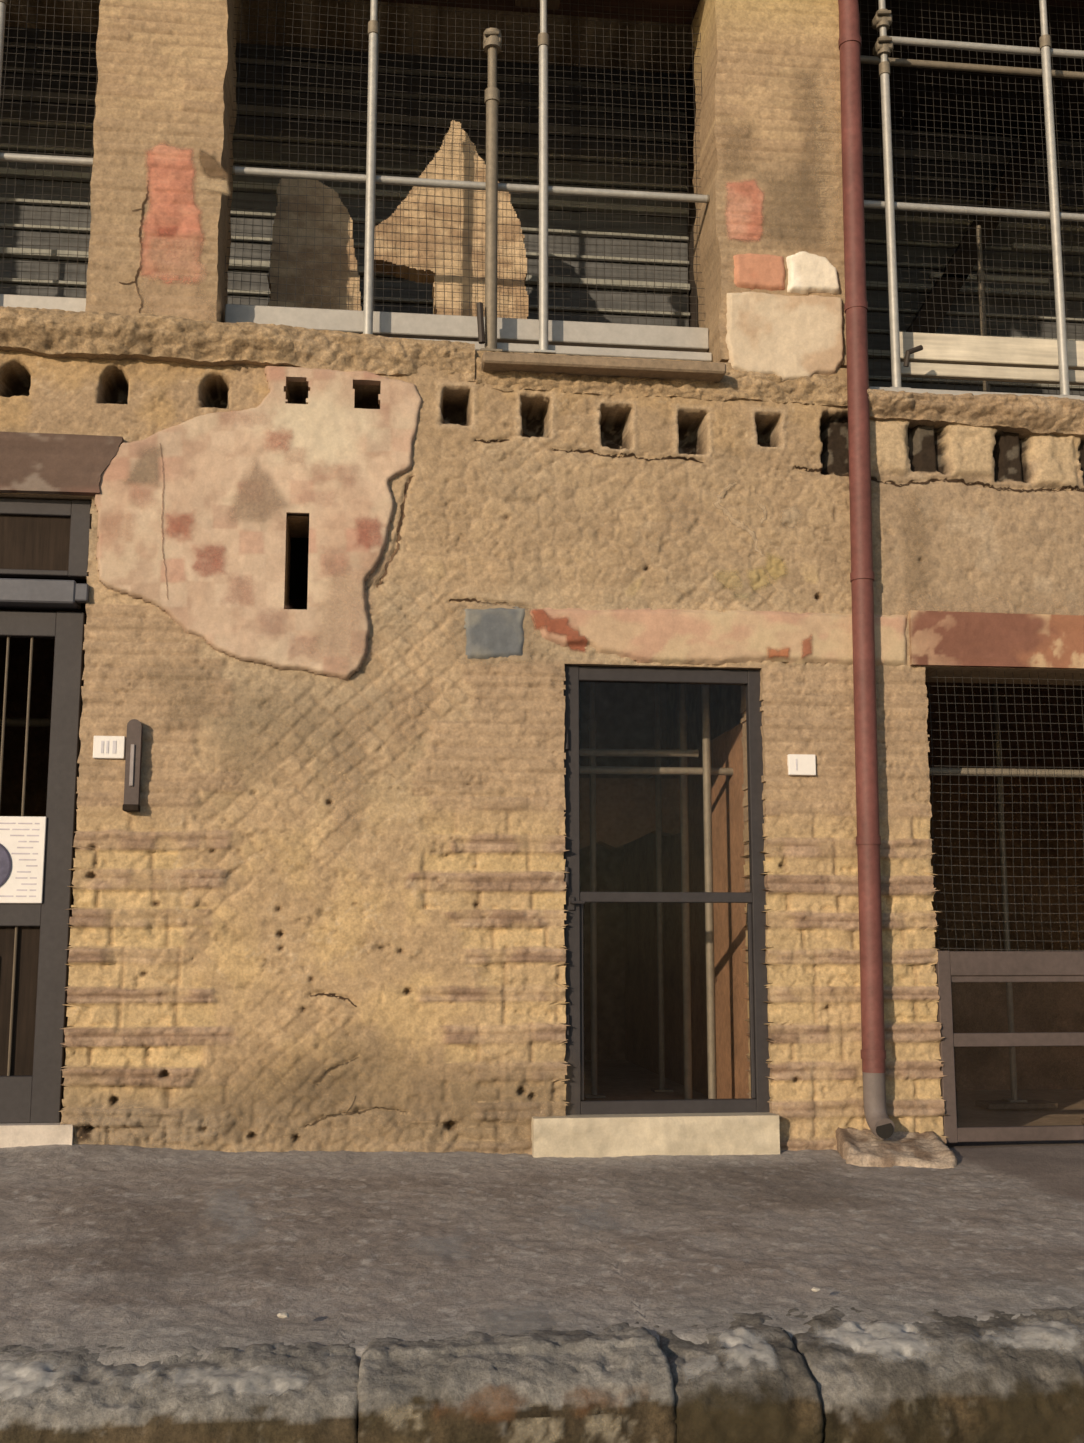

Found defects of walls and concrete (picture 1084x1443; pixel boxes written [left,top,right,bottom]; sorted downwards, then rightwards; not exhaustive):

crack [119,181,149,313]
crack [475,437,509,445]
crack [552,448,703,463]
crack [795,466,1084,493]
flaking render [95,366,423,680]
peeling [532,610,588,652]
peeling [768,635,812,658]